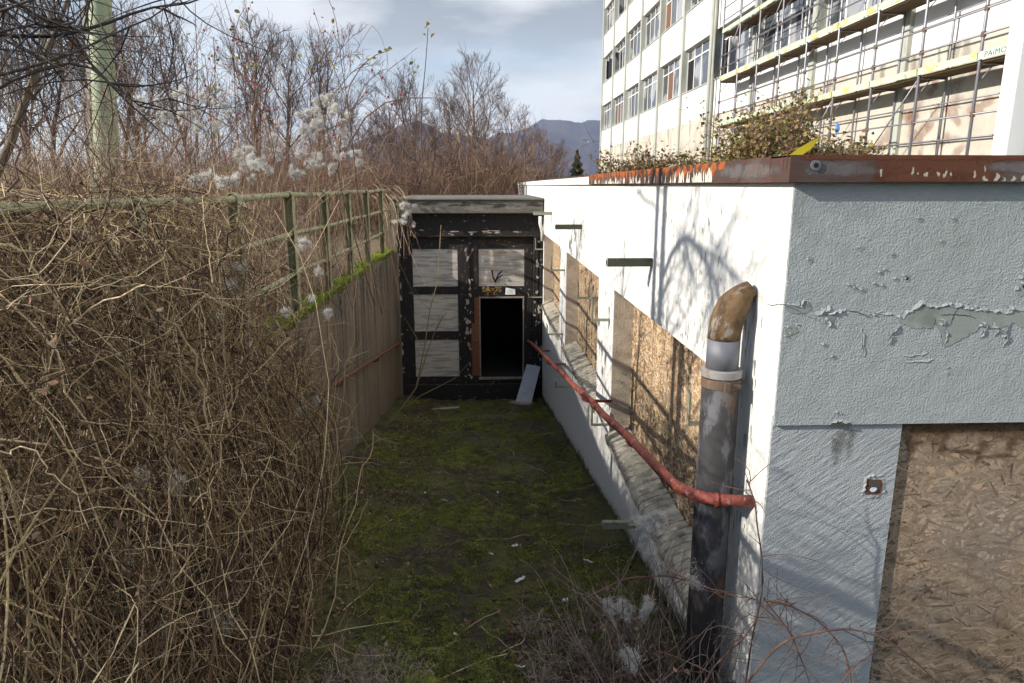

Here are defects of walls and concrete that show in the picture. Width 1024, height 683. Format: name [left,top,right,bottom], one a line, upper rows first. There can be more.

corrosion [590,162,725,181]
corrosion [801,155,1024,182]
peeling [784,299,846,337]
peeling [870,300,1024,349]
corrosion [861,473,886,499]